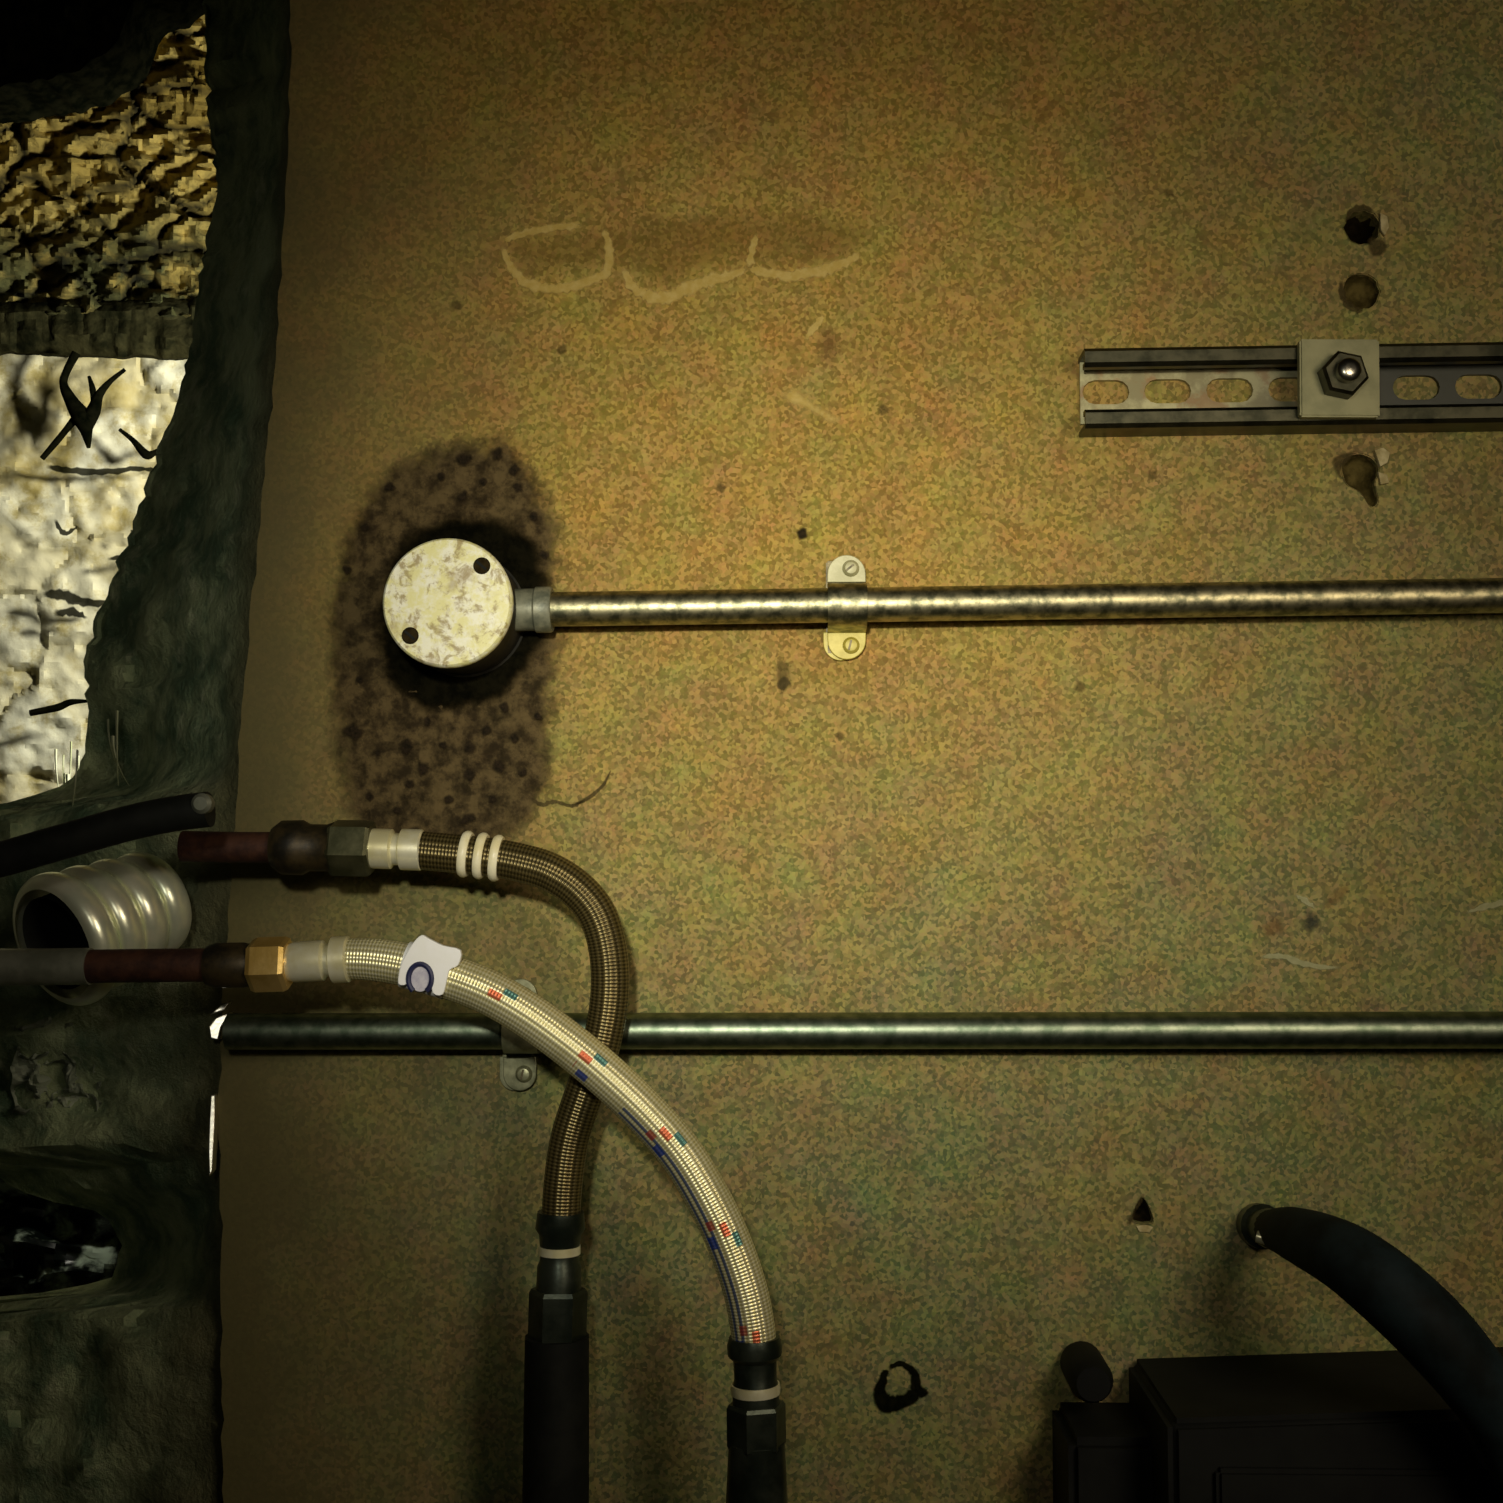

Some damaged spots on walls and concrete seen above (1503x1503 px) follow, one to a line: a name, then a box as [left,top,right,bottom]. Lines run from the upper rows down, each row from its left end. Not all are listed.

water stain [502,223,859,304]
crack [48,465,153,476]
crack [55,520,77,536]
crack [44,589,105,618]